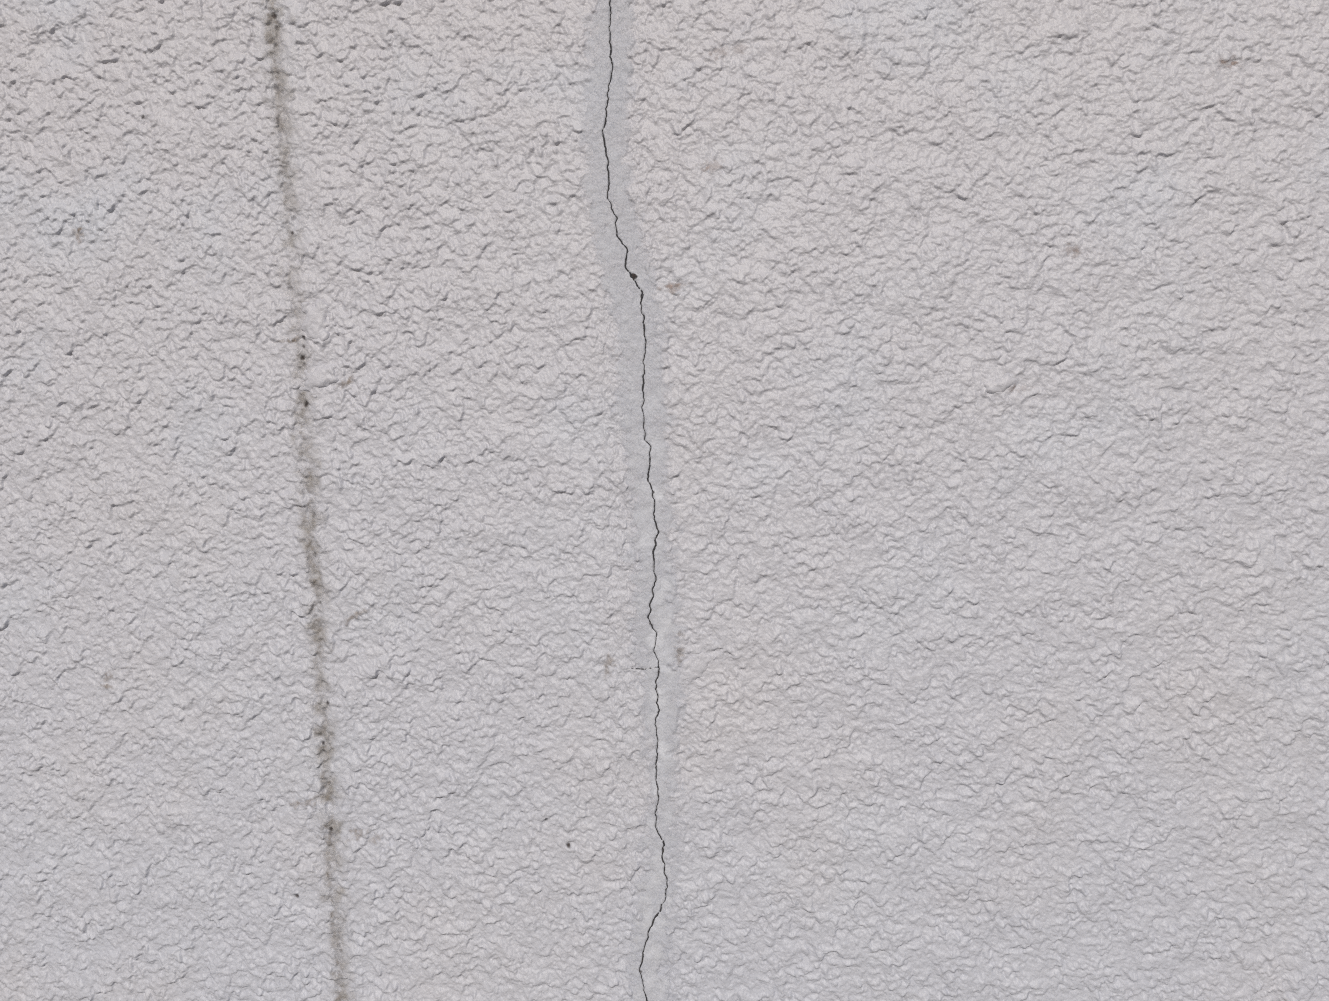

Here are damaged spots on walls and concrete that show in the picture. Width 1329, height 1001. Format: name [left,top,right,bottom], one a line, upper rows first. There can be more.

crack [602,0,668,1001]